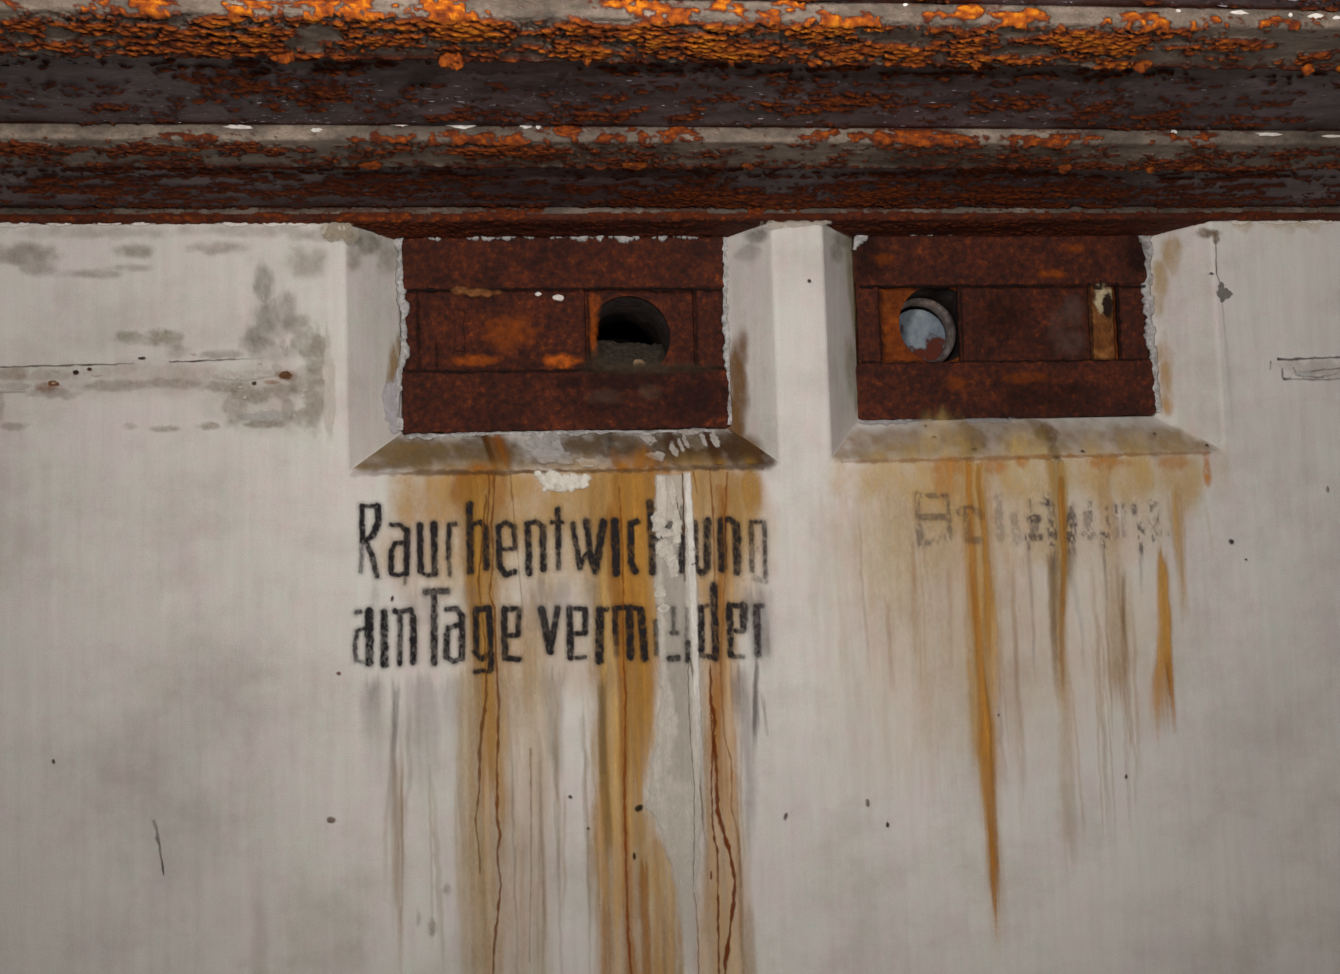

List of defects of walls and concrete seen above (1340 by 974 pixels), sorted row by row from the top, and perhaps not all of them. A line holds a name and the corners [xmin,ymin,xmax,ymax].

rust [388,347,399,382]
rust [456,287,491,297]
rust [910,338,945,361]
crack [475,474,513,970]
rust [400,338,773,974]
crack [698,606,736,974]
rust [882,424,1068,910]
rust [1155,552,1173,707]